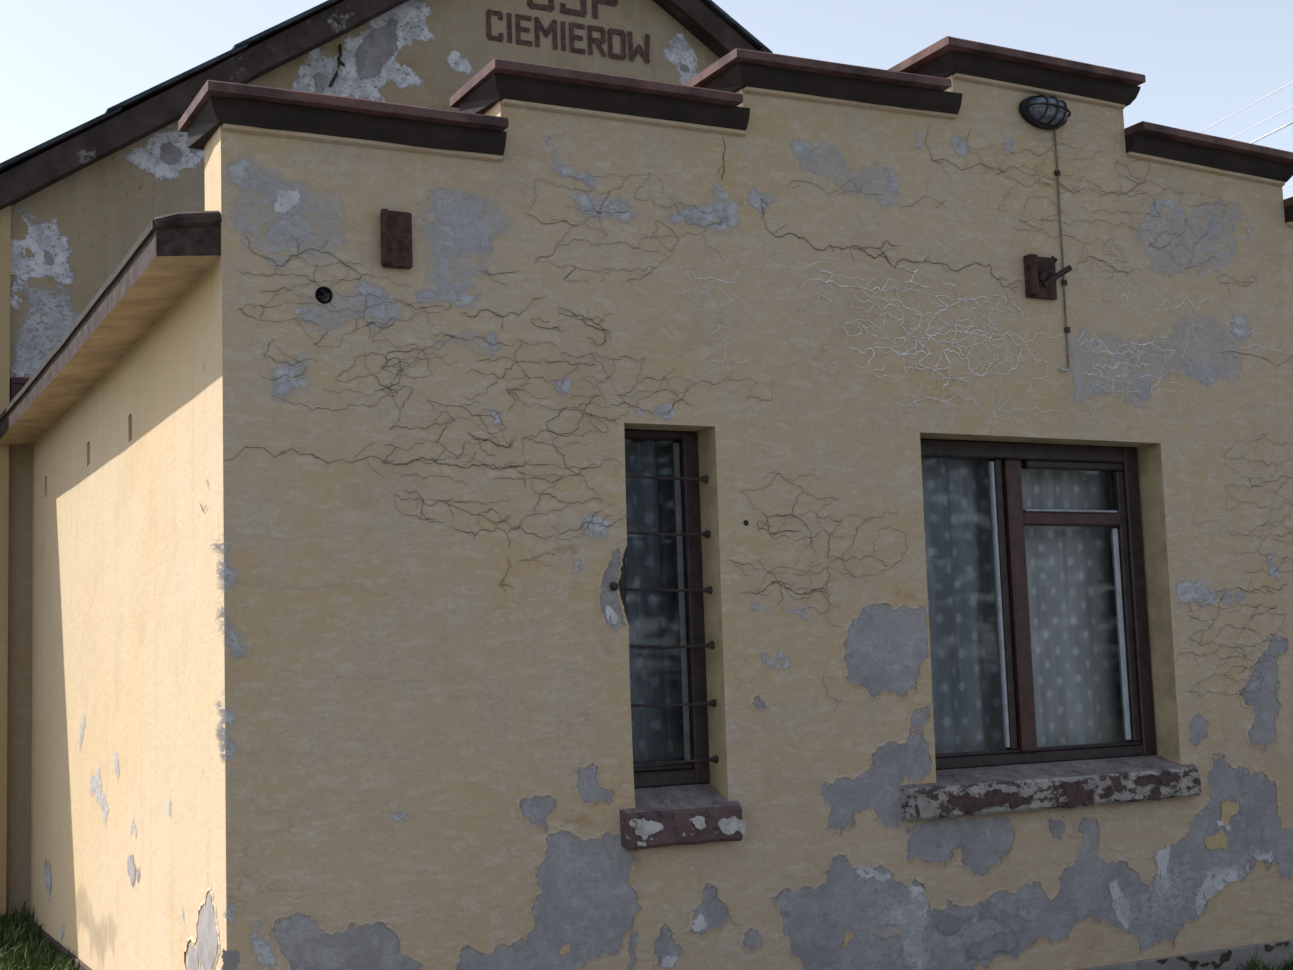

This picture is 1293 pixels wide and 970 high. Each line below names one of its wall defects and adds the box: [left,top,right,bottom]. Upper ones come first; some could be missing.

peeling [292,0,435,102]
peeling [125,125,204,181]
peeling [10,207,80,377]
crack [229,136,774,591]
crack [760,122,1293,424]
crack [728,471,907,627]
crack [1180,434,1293,697]
peeling [216,702,236,762]
peeling [454,599,1293,970]
peeling [181,886,426,970]